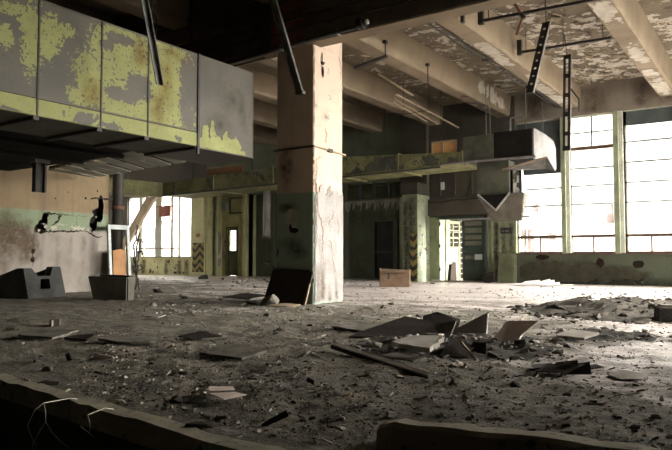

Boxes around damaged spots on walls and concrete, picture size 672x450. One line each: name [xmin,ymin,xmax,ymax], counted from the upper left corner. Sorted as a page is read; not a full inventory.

peeling [401,23,530,117]
peeling [536,79,572,105]
peeling [491,0,672,96]
peeling [73,112,125,132]
peeling [345,156,404,175]
crack [30,212,102,264]
spalling [34,190,104,234]
crack [315,157,339,271]